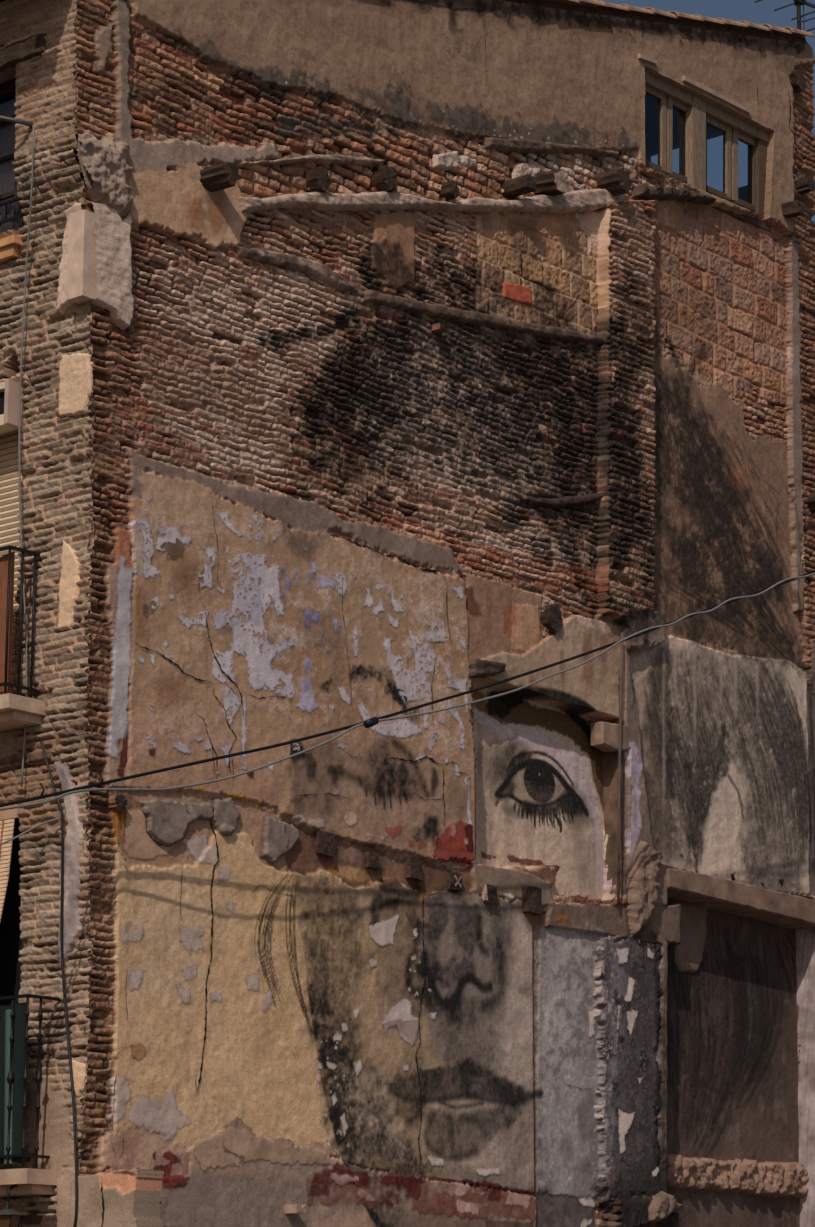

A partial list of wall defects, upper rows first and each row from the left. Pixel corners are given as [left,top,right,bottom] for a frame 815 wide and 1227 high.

leakage [409,0,455,25]
leakage [476,0,805,56]
peeling [106,511,559,872]
crack [134,496,290,1113]
peeling [561,895,628,906]
peeling [368,914,420,972]
peeling [616,940,654,964]
peeling [382,987,436,1045]
peeling [617,977,638,1035]
peeling [150,1008,535,1222]
peeling [618,1109,635,1153]
peeling [578,1196,595,1227]